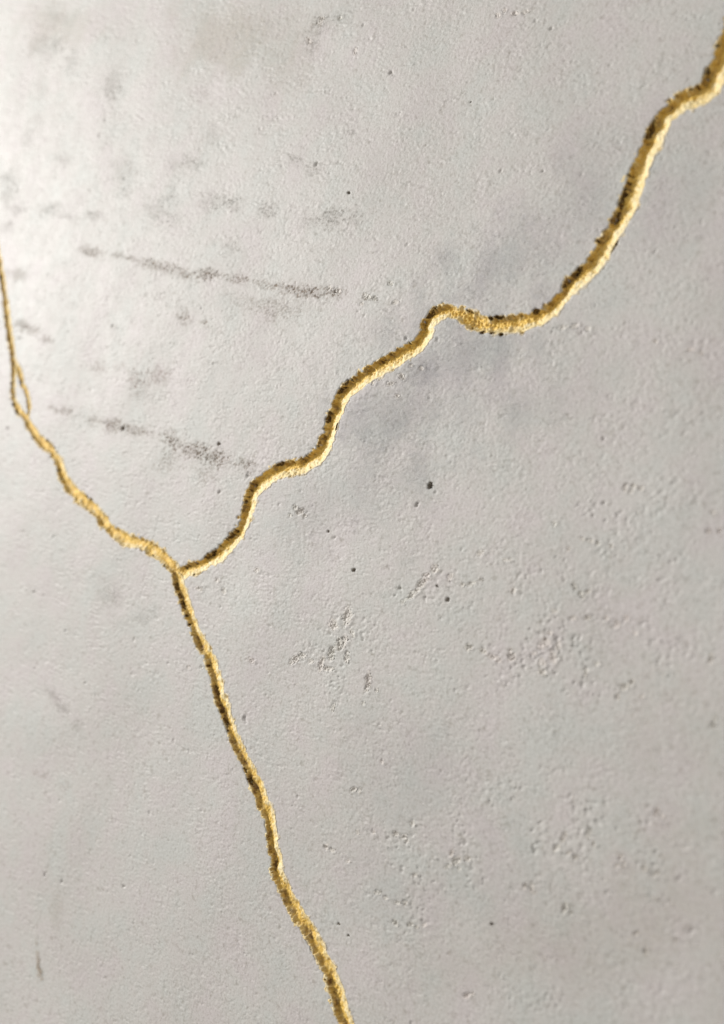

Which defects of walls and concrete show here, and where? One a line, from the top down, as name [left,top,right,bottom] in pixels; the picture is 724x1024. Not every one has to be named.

crack [0,30,724,580]
crack [171,570,355,1024]